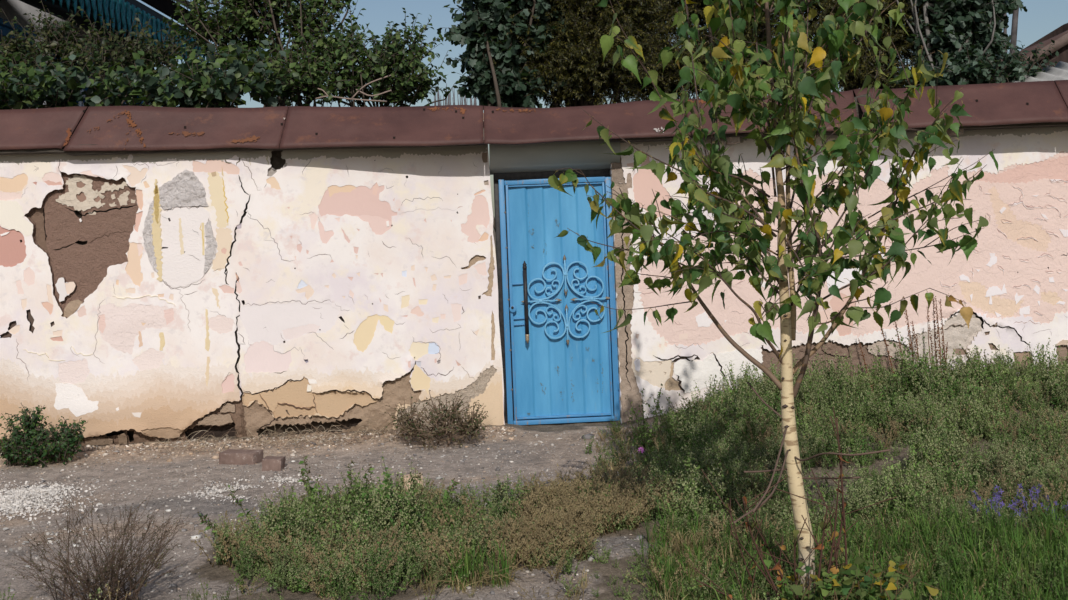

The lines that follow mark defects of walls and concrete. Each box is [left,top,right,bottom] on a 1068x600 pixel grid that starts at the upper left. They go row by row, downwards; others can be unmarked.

spalling [0,165,154,341]
crack [21,160,135,250]
peeling [75,311,497,446]
crack [162,160,476,430]
peeling [309,182,400,258]
peeling [353,180,495,352]
peeling [610,151,1068,423]